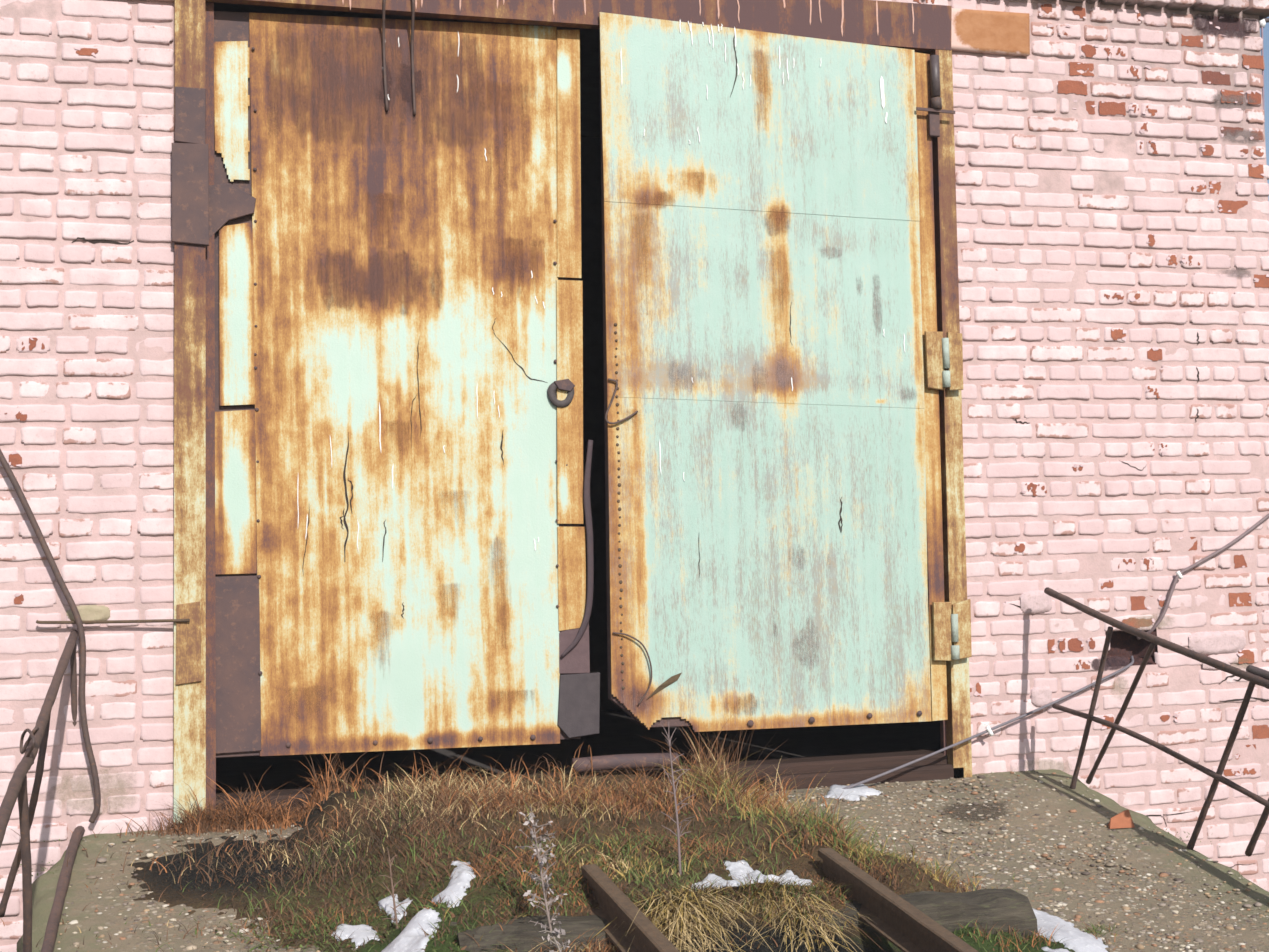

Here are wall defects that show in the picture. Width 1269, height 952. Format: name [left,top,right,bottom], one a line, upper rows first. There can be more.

spalling [1058,44,1158,154]
spalling [1201,71,1262,104]
spalling [1200,126,1266,178]
spalling [1185,180,1248,214]
spalling [1254,274,1269,288]
peeling [1147,347,1163,361]
peeling [1022,483,1047,496]
spalling [1234,554,1252,569]
spalling [1229,592,1252,607]
spalling [1048,596,1166,670]
crack [1220,675,1269,702]
spalling [1224,725,1269,776]